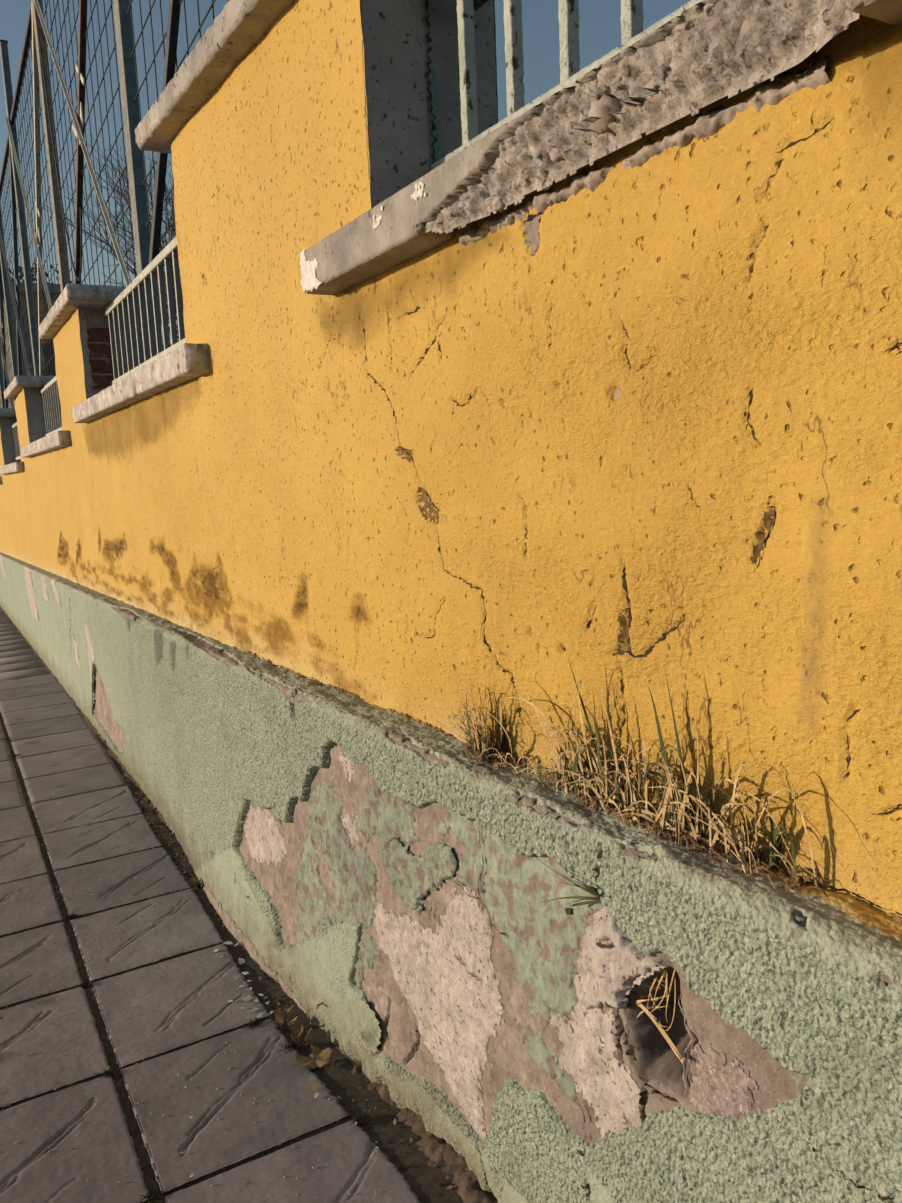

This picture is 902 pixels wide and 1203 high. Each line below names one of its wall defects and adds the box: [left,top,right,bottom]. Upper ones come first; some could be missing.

spalling [424,0,859,256]
crack [360,298,445,484]
peeling [72,624,125,753]
water stain [57,529,250,648]
water stain [153,630,187,667]
water stain [265,576,307,652]
water stain [352,602,366,621]
crack [423,527,603,796]
crack [612,560,685,736]
crack [711,839,902,915]
peeling [206,888,308,1017]
peeling [239,744,814,1144]